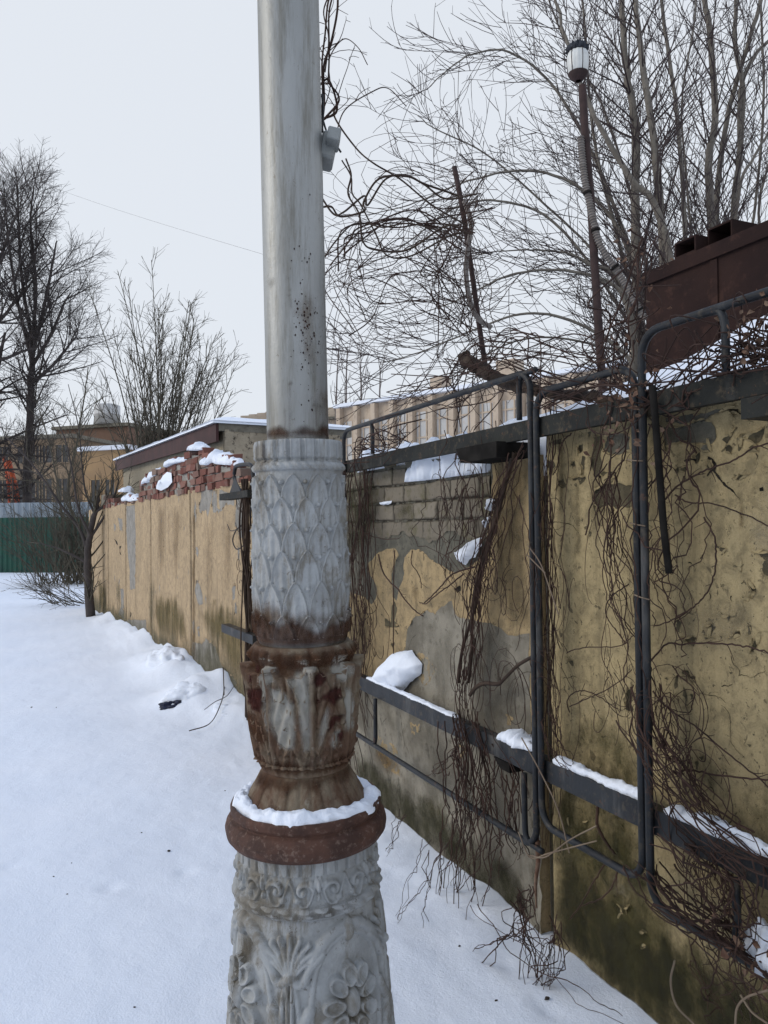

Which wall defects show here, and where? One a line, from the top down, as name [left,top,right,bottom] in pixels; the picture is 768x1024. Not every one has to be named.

corrosion [246,607,357,792]
spalling [346,461,531,734]
spalling [349,690,542,935]